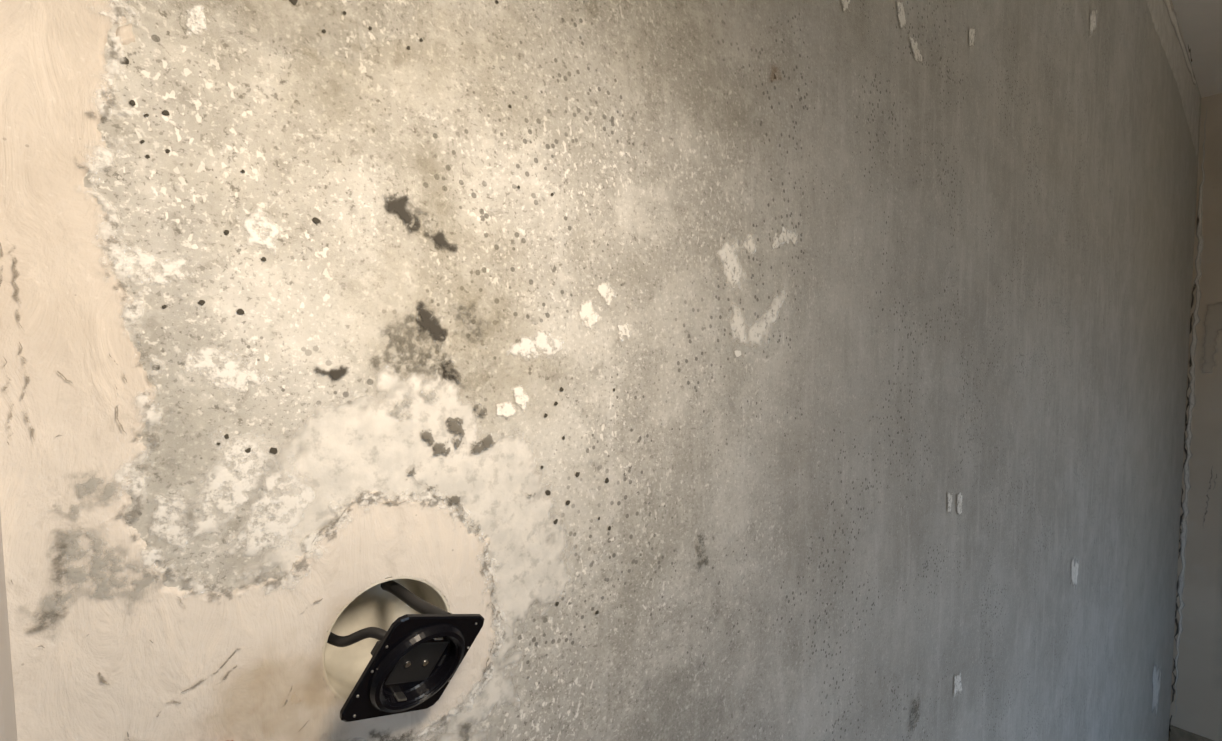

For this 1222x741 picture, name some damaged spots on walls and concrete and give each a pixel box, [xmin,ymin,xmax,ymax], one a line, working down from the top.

water stain [386,196,457,251]
peeling [0,0,505,741]
water stain [316,366,348,380]
water stain [373,302,459,380]